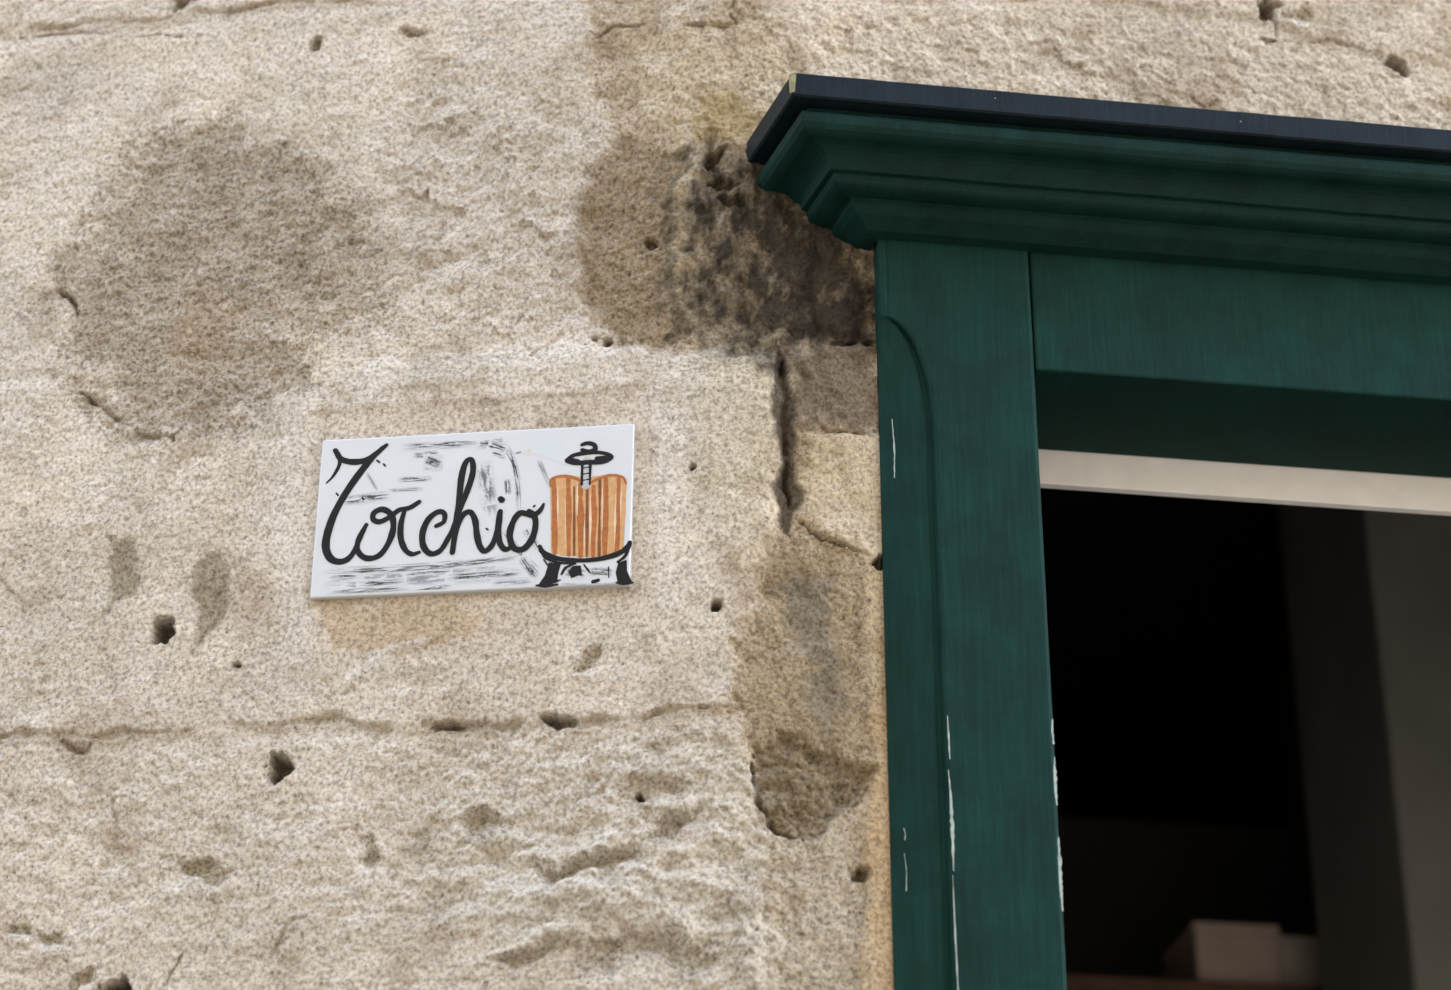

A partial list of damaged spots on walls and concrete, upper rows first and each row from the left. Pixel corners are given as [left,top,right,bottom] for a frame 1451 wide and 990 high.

leakage [641,144,877,541]
leakage [764,559,860,765]
spalling [348,715,865,990]
peeling [947,715,959,990]